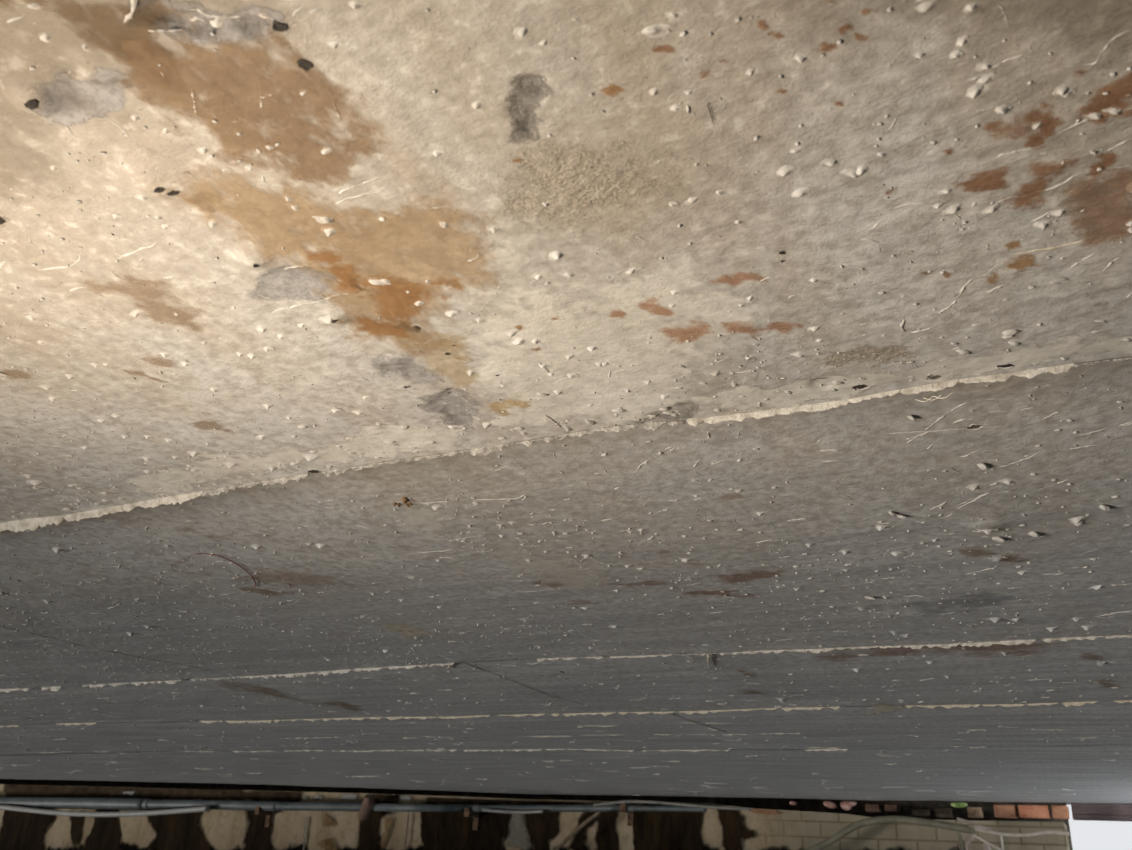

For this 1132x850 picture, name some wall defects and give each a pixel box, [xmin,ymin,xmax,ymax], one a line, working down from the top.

rust [1077,72,1132,124]
rust [984,103,1064,149]
water stain [24,0,1132,427]
rust [956,153,1132,246]
rust [1005,241,1037,269]
rust [307,252,462,337]
rust [712,273,764,286]
rust [639,298,801,342]
water stain [2,370,30,378]
water stain [194,421,229,431]